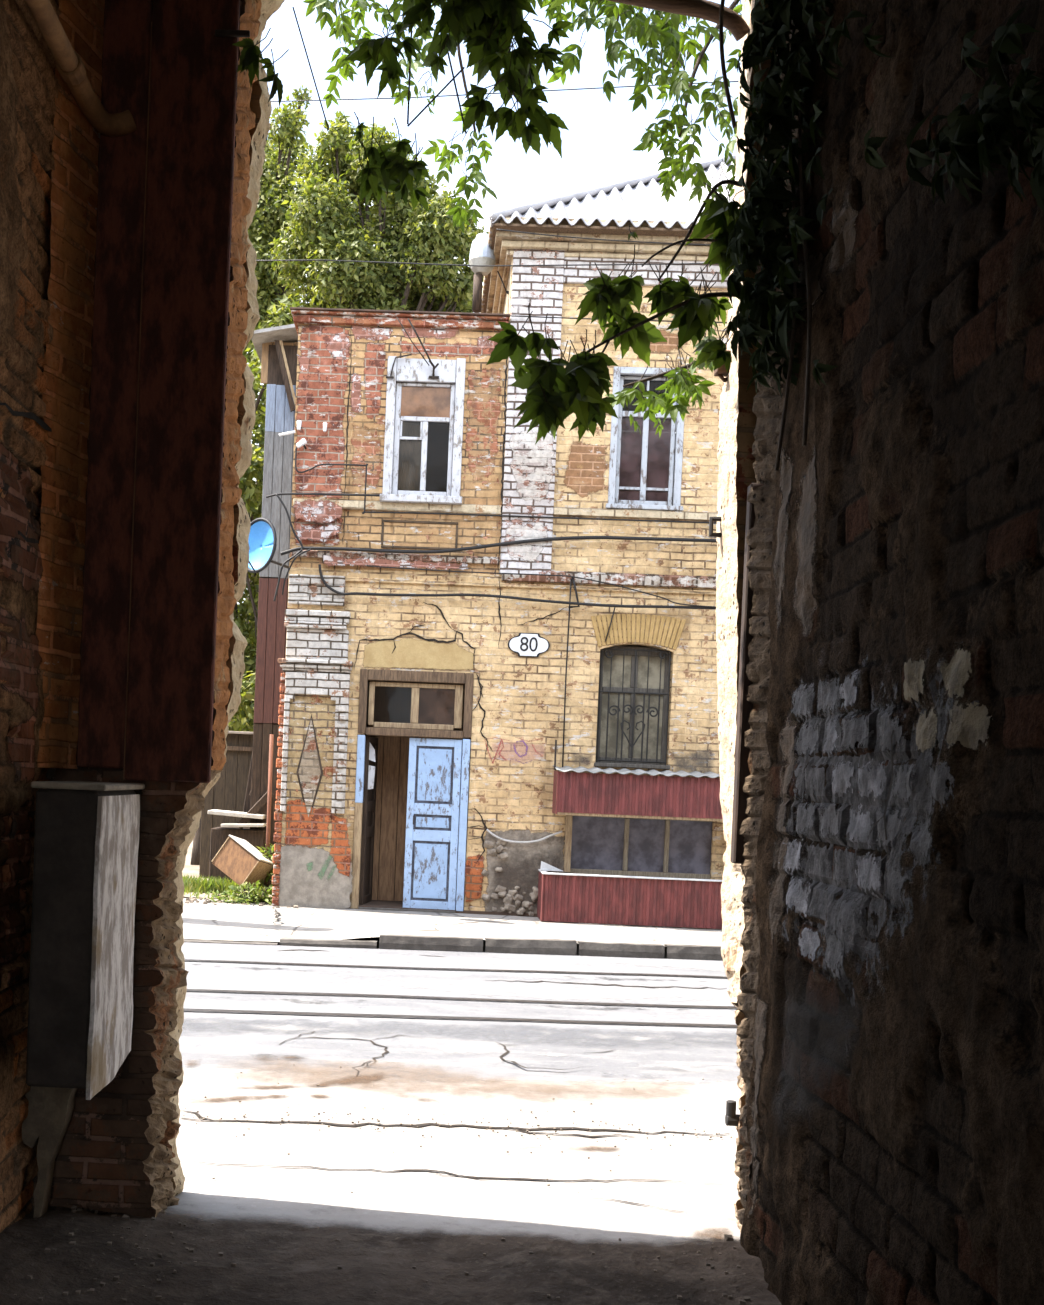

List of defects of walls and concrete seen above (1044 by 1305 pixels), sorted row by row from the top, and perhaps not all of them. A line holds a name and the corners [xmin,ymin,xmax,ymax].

peeling [650,330,682,353]
peeling [293,324,607,570]
crack [354,358,566,757]
spalling [278,799,353,909]
crack [468,808,487,862]
peeling [778,639,993,1016]
crack [279,1037,389,1066]
crack [497,1042,579,1070]
crack [183,1118,731,1135]
crack [183,1160,690,1183]